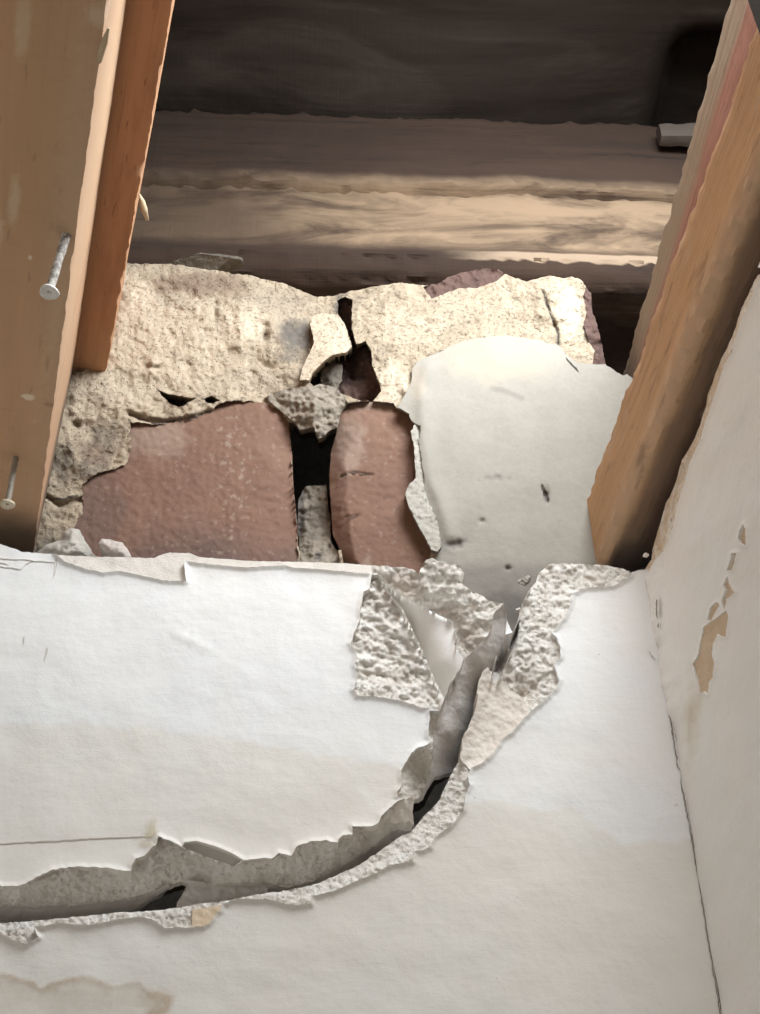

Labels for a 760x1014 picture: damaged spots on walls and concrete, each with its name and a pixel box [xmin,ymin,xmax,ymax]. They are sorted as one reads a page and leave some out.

crack [0,557,57,576]
flaking render [58,274,760,770]
crack [0,604,507,944]